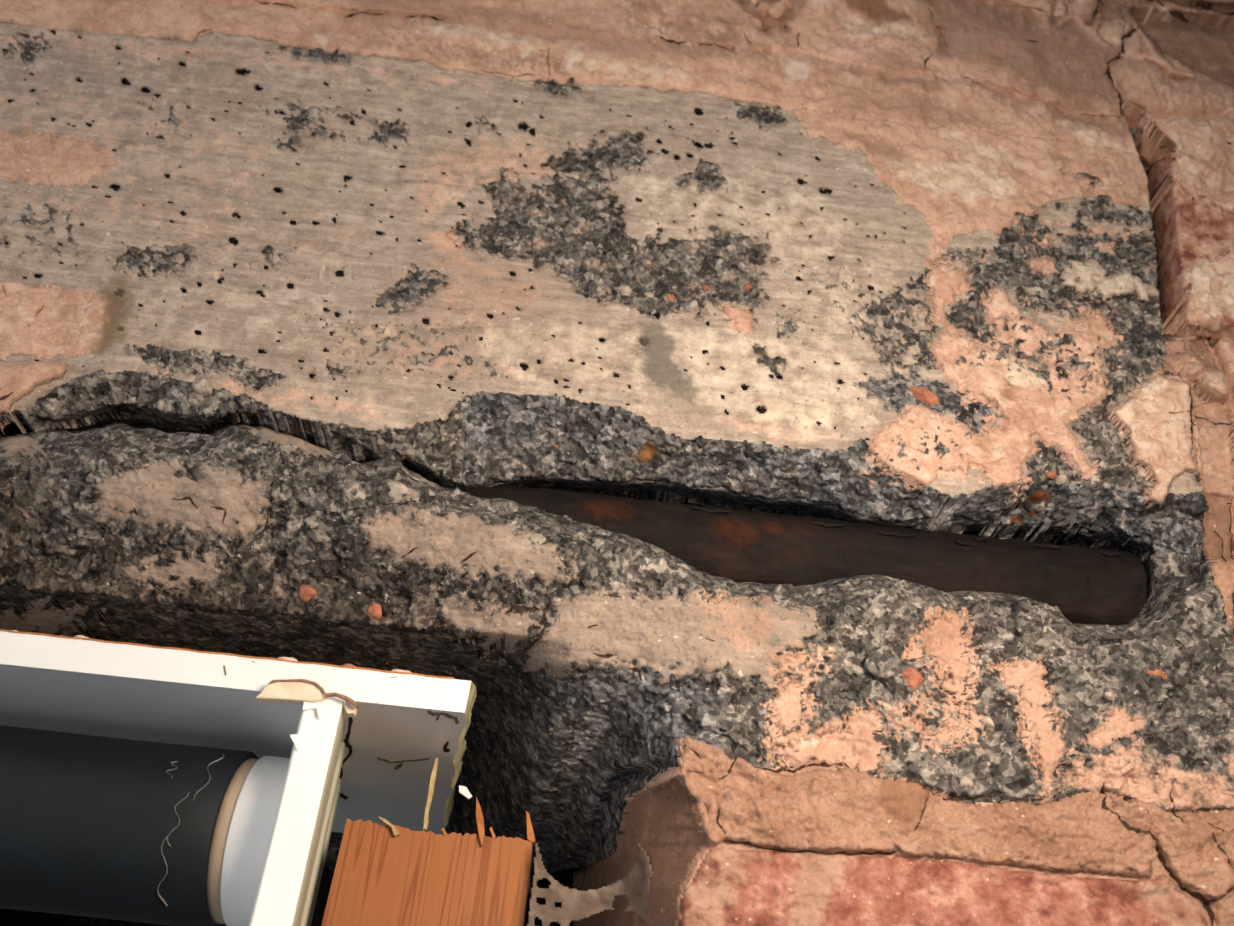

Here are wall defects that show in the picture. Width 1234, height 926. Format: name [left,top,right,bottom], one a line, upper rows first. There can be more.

crack [254,0,296,9]
crack [345,12,444,21]
spalling [279,46,353,66]
spalling [534,77,582,99]
spalling [278,100,343,154]
spalling [729,102,789,131]
spalling [445,127,782,322]
crack [0,392,317,446]
crack [334,458,460,516]
spalling [0,172,1234,878]
crack [1200,503,1233,563]
crack [968,783,1234,926]